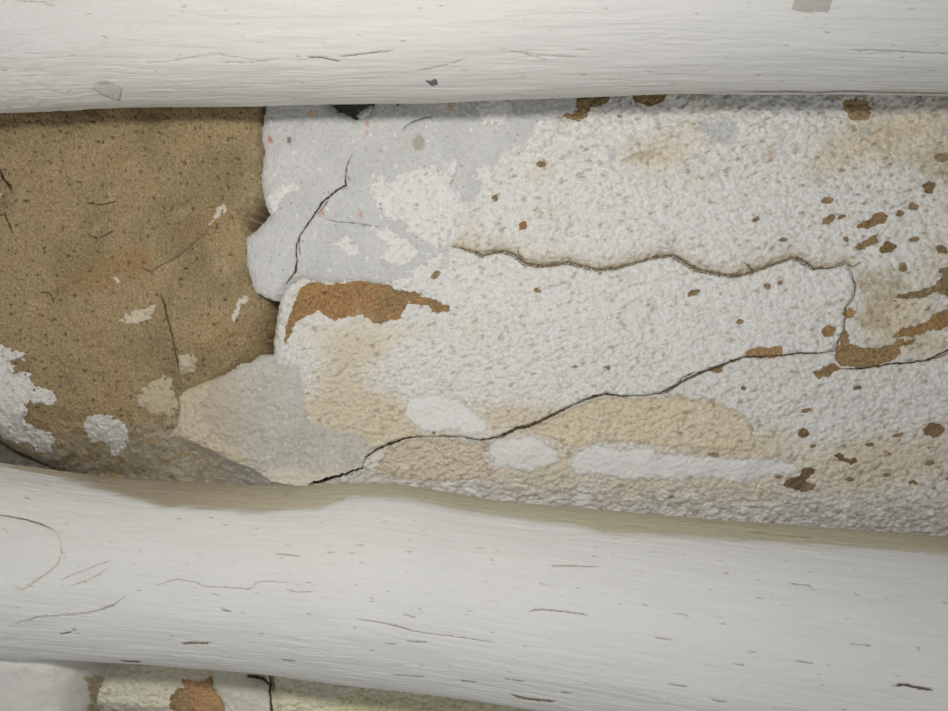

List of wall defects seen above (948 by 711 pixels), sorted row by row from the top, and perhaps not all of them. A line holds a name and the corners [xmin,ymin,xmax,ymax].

peeling [792,0,832,13]
peeling [554,96,610,122]
peeling [631,94,669,107]
crack [287,158,378,283]
peeling [891,267,948,299]
peeling [284,280,450,343]
crack [313,246,948,483]
peeling [813,309,948,379]
peeling [774,467,816,492]
crack [3,515,110,590]
peeling [169,676,225,711]
crack [247,660,295,711]